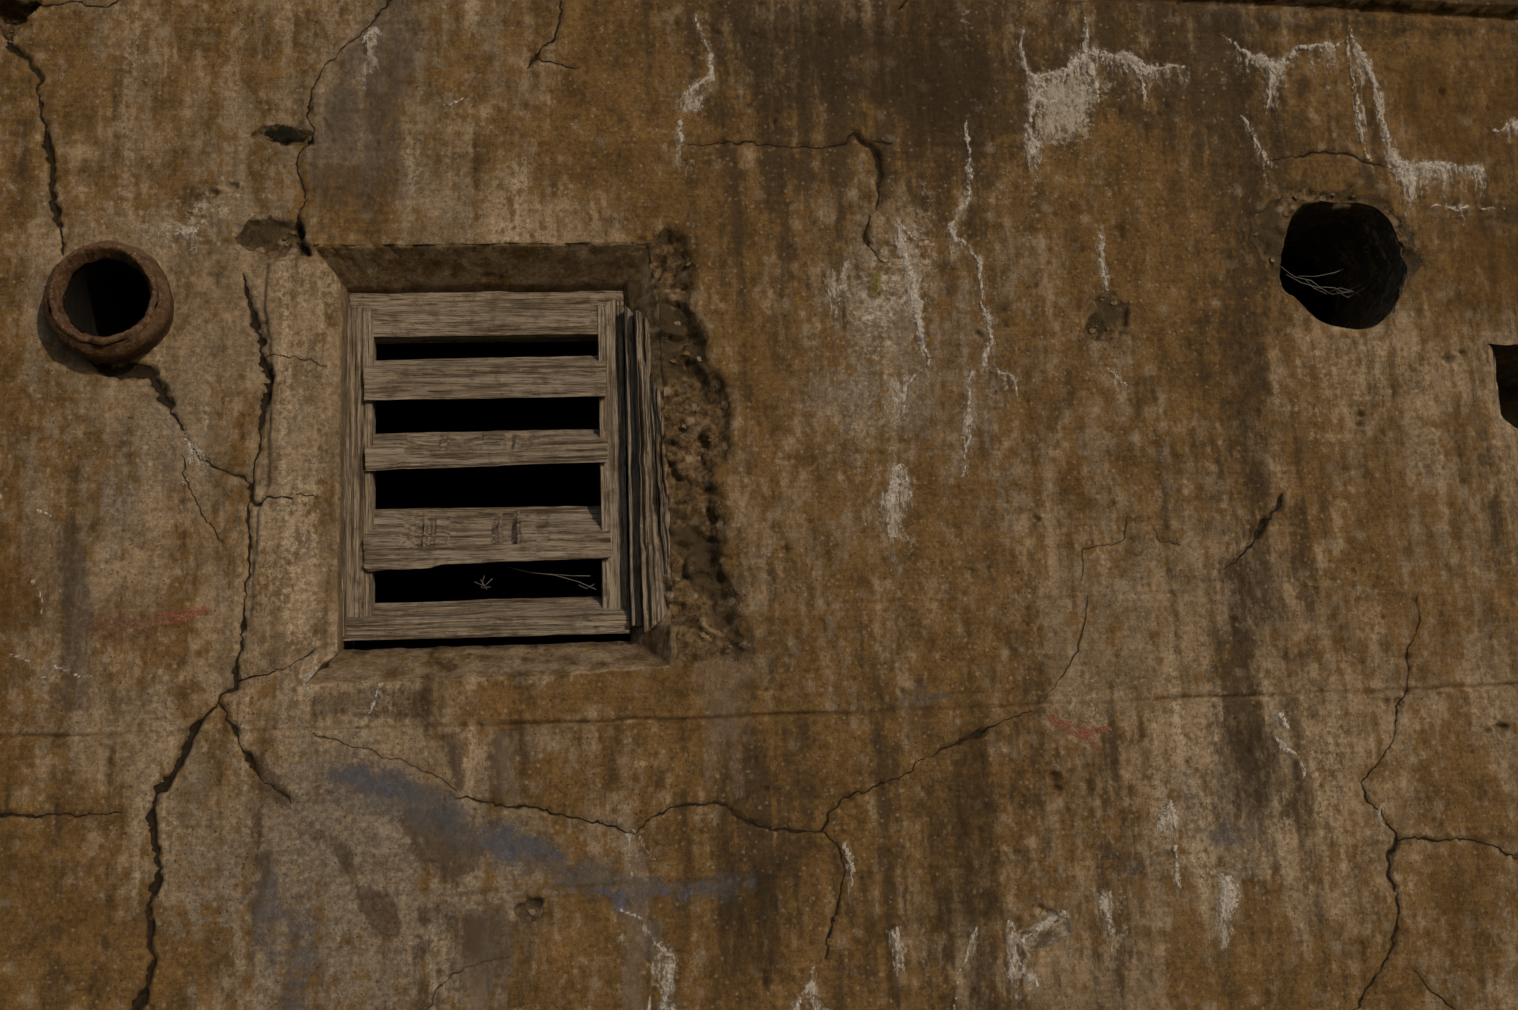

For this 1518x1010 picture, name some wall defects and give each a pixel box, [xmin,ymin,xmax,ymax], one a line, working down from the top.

crack [295,0,390,257]
water stain [1019,17,1187,168]
water stain [1226,29,1505,218]
spalling [636,227,745,665]
crack [1219,493,1283,570]
crack [0,273,326,1010]
crack [313,516,1181,959]
crack [1354,591,1518,1010]
water stain [620,909,675,1010]
water stain [793,965,826,1010]
water stain [891,926,907,975]
water stain [1006,910,1071,1000]